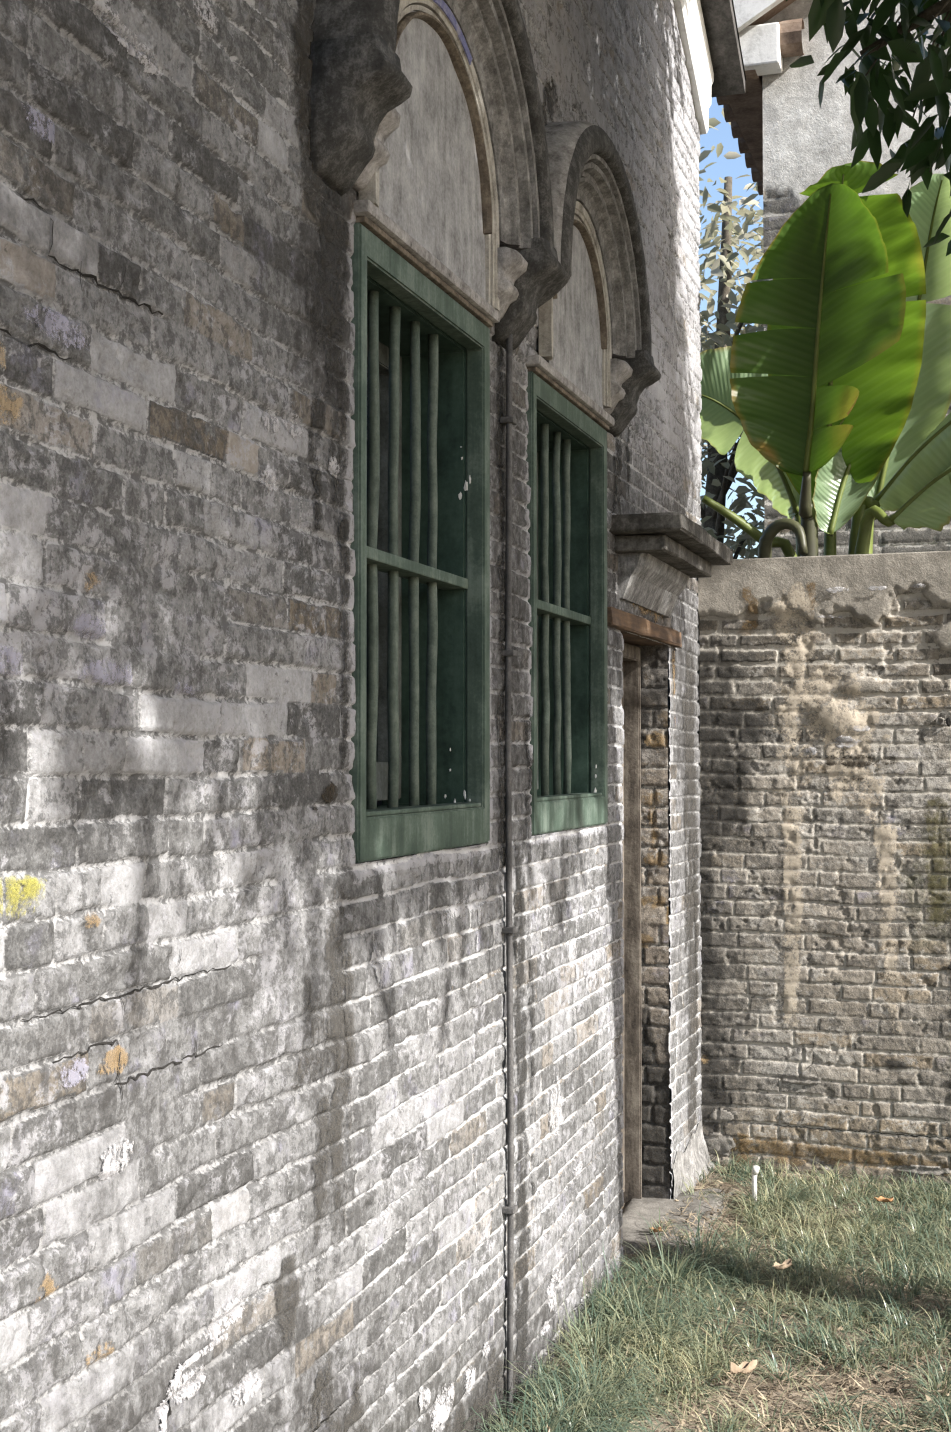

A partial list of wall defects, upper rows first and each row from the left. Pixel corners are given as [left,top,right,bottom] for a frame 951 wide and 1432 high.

crack [17,192,163,315]
water stain [292,0,686,1432]
water stain [645,582,902,1139]
crack [22,949,232,1097]
water stain [885,1058,914,1085]
water stain [274,1255,300,1366]